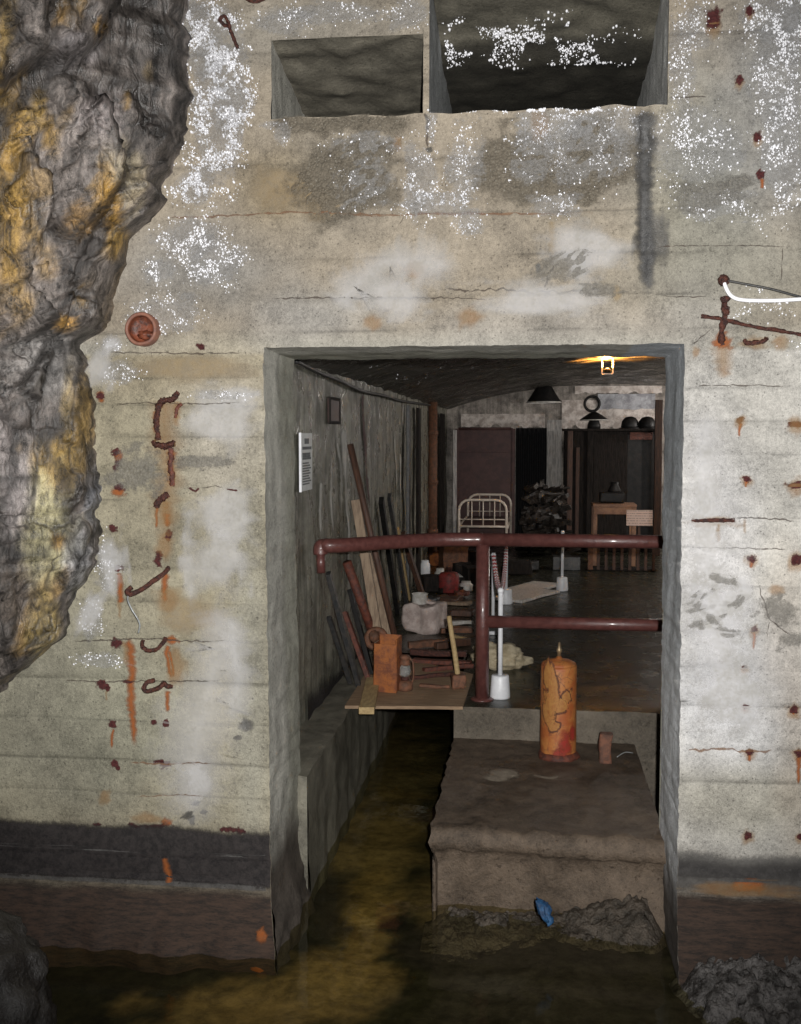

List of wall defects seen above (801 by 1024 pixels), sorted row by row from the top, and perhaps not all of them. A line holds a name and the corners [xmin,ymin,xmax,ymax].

leakage [278,0,430,38]
leakage [443,9,640,70]
leakage [121,0,290,335]
leakage [492,0,801,288]
leakage [729,286,796,324]
leakage [96,339,148,386]
rust [111,448,126,495]
rust [115,566,124,602]
rust [154,508,172,601]
rust [164,636,180,676]
rust [111,637,137,740]
leakage [0,820,276,976]